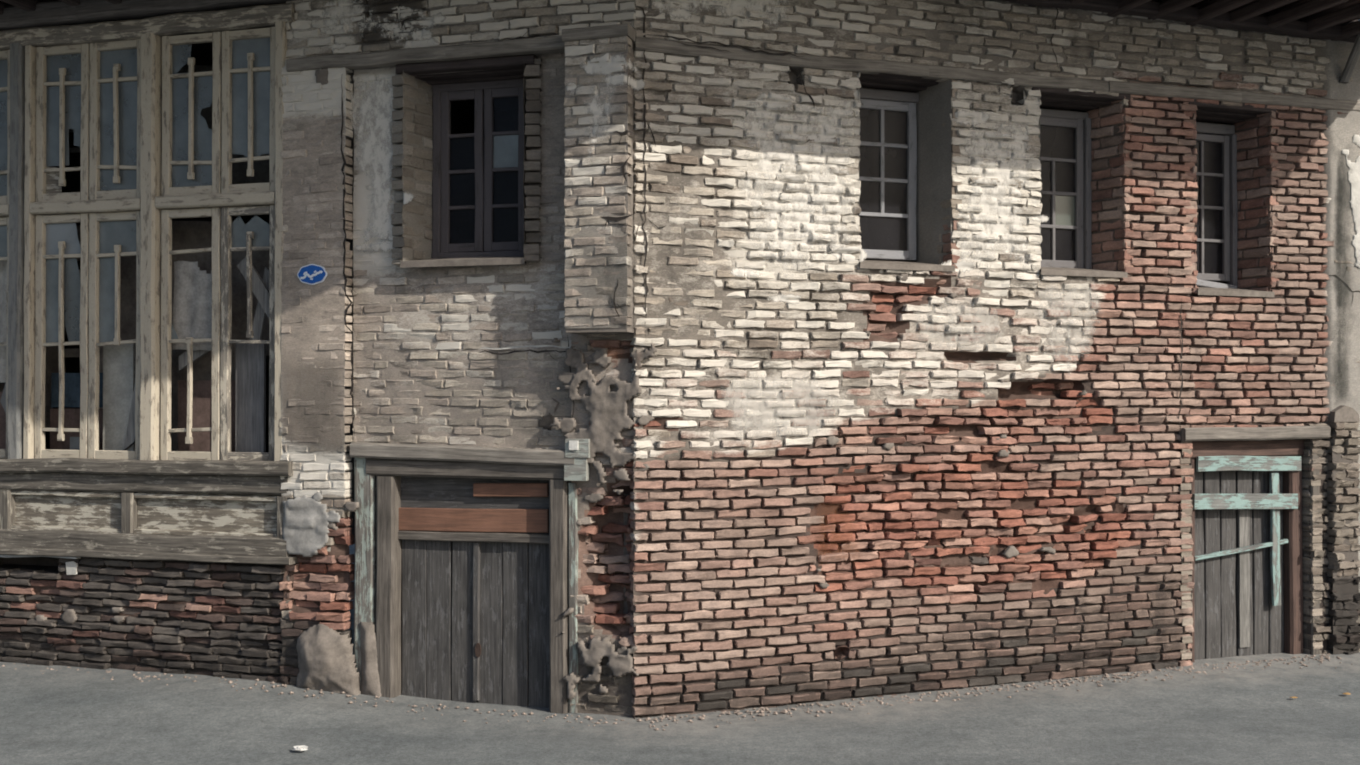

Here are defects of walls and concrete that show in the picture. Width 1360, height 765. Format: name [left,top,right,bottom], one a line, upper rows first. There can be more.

flaking render [1341,134,1360,269]
spalling [539,338,683,700]